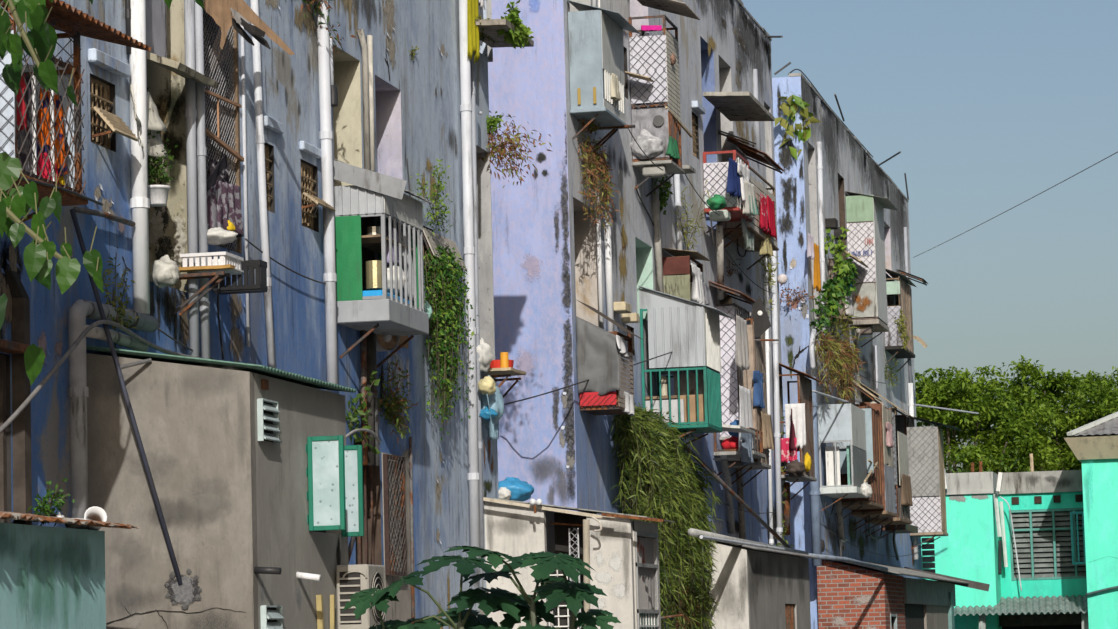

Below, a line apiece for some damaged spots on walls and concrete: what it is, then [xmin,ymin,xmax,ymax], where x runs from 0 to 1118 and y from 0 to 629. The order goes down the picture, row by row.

peeling [383,0,398,70]
water stain [779,135,804,274]
water stain [801,77,907,270]
water stain [534,114,576,504]
crack [106,598,253,629]
spalling [164,568,202,610]